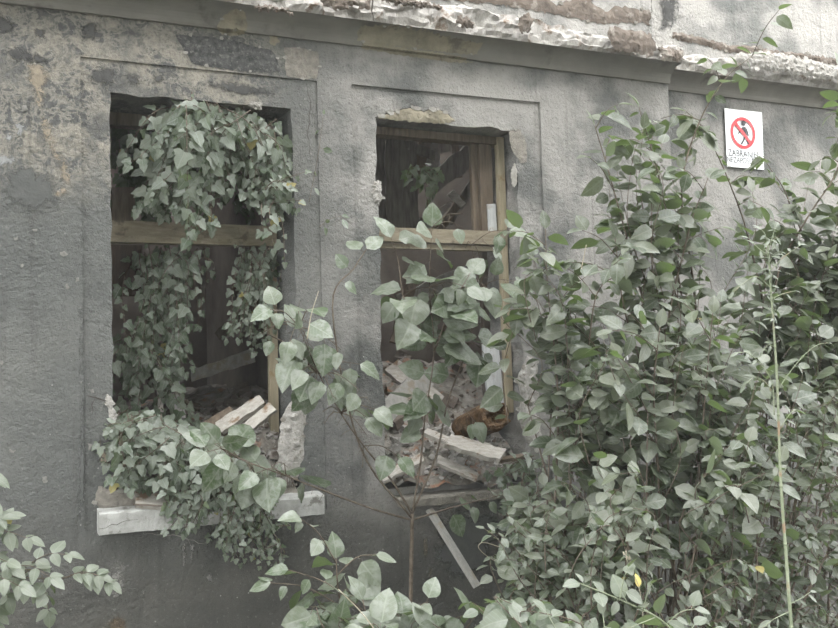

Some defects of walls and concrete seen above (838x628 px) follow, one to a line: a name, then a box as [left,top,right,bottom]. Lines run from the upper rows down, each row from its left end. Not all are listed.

flaking render [448,0,651,30]
damp [6,47,48,63]
damp [81,23,97,41]
flaking render [176,9,287,73]
peeling [357,24,483,63]
flaking render [672,32,837,66]
damp [91,68,114,85]
damp [210,81,275,96]
peeling [377,105,455,124]
damp [0,154,58,209]